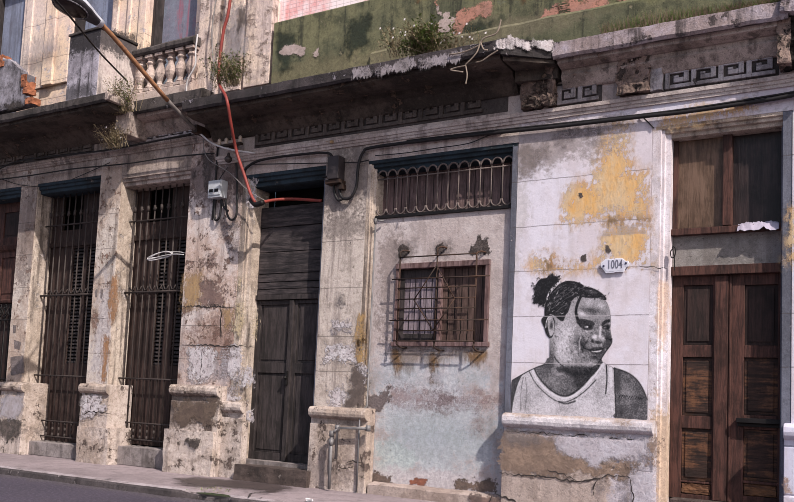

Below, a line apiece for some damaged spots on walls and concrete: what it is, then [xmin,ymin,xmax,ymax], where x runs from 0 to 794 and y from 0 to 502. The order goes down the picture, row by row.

peeling [434,0,493,36]
peeling [541,0,625,18]
spalling [21,74,41,108]
peeling [245,177,259,210]
peeling [530,122,652,275]
spalling [468,234,492,256]
peeling [171,254,261,428]
corrosion [392,349,403,375]
corrosion [468,352,486,364]
spalling [185,437,201,450]
crack [510,431,644,440]
crack [500,469,635,502]